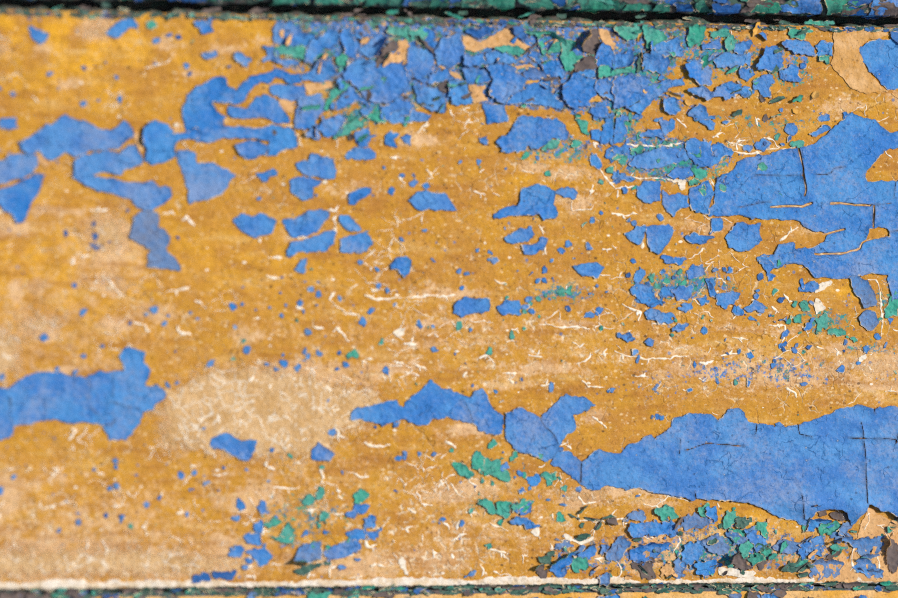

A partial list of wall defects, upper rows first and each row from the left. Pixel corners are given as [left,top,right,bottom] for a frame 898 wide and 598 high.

peeling [0,0,898,386]
crack [571,169,665,219]
crack [627,118,687,147]
crack [713,117,874,255]
peeling [0,346,180,441]
crack [7,338,390,580]
crack [307,440,528,580]
peeling [0,379,898,598]
crack [296,211,748,395]
crack [539,423,681,552]
crack [770,293,839,398]
crack [868,279,898,344]